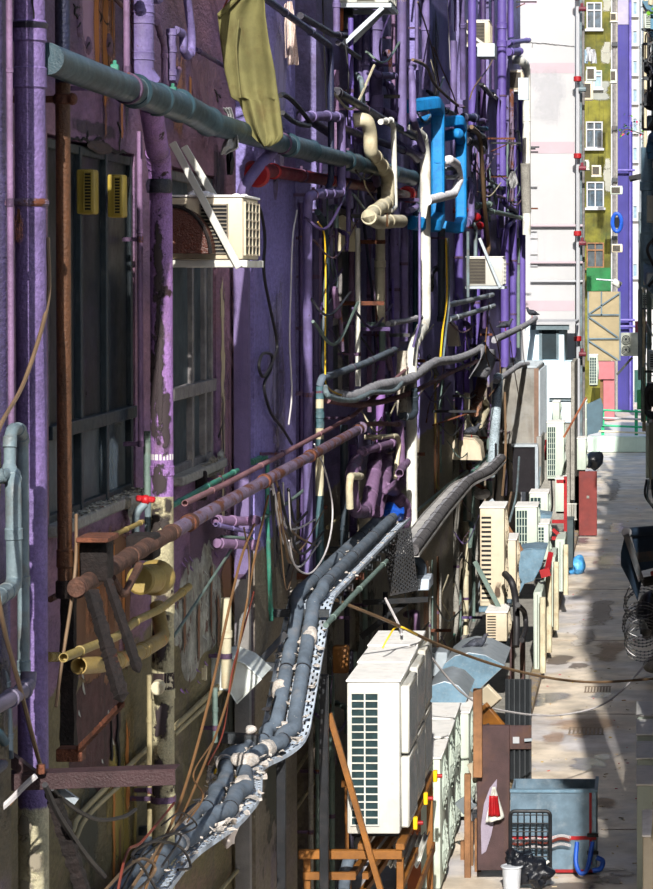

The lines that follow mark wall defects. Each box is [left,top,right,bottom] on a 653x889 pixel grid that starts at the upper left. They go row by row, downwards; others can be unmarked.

corrosion [94,0,115,67]
peeling [150,208,172,532]
spalling [151,540,221,694]
peeling [155,702,170,740]